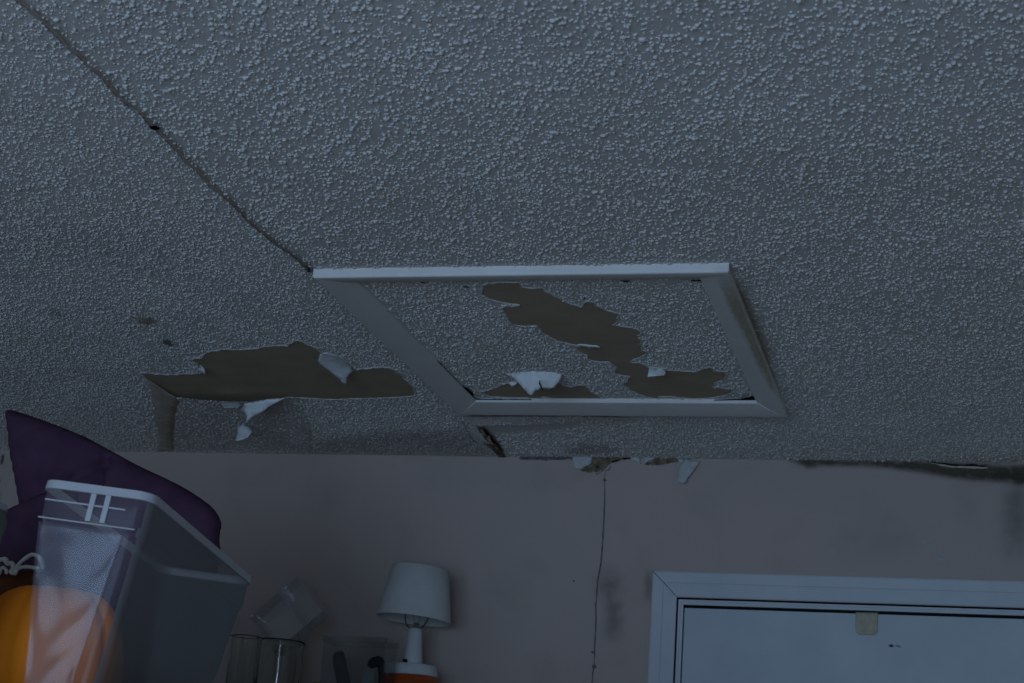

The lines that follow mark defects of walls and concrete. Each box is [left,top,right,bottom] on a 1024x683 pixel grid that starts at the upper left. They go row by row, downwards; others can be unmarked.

crack [15,0,311,273]
peeling [140,339,417,451]
crack [460,416,635,458]
peeling [478,282,734,400]
spalling [519,456,700,483]
damp [799,460,1024,484]
crack [591,464,611,683]